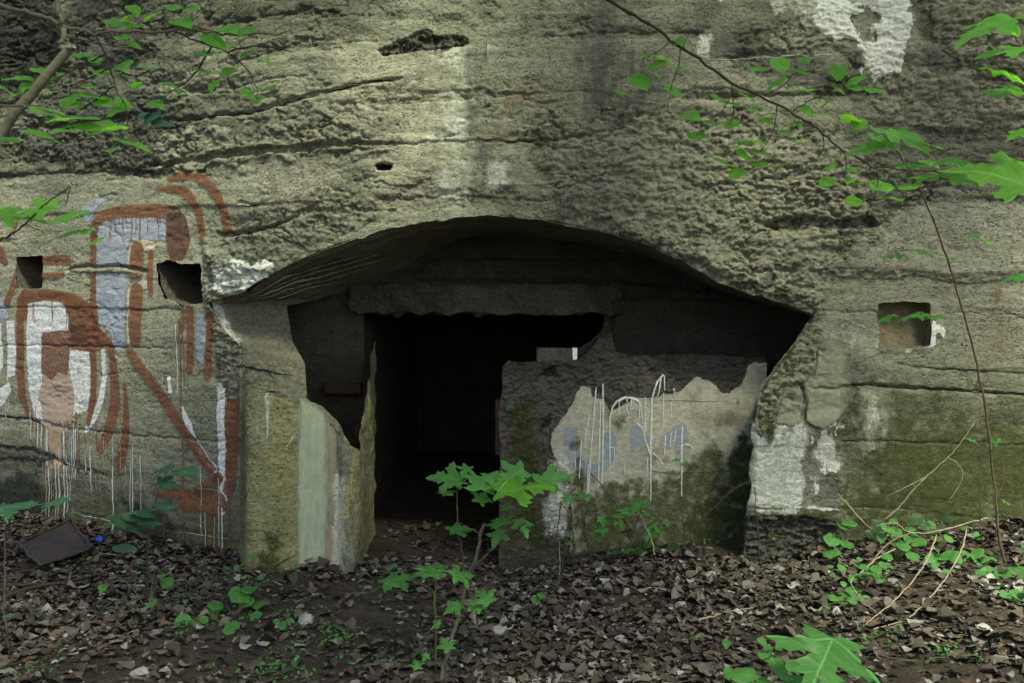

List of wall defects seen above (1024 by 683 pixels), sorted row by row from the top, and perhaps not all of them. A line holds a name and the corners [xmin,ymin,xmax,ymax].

spalling [380,30,467,55]
spalling [759,0,1024,134]
leakage [865,392,886,434]